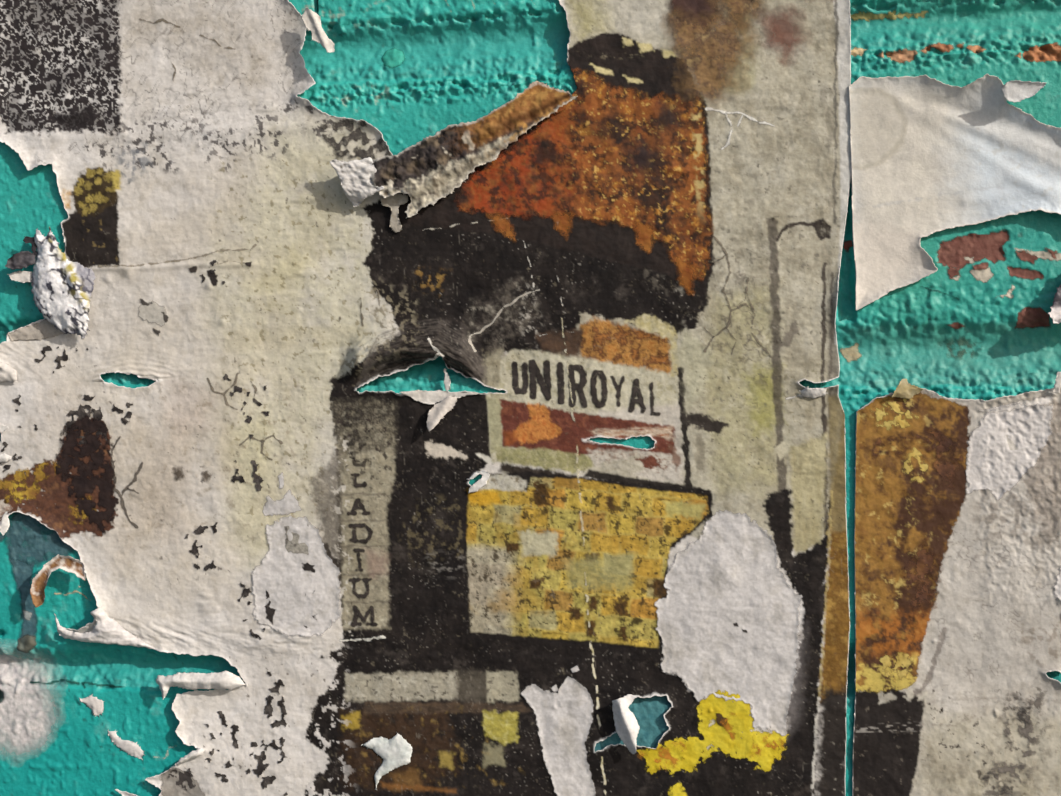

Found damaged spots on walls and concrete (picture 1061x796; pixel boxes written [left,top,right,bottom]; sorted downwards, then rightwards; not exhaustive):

peeling [851,43,986,63]
peeling [1016,42,1061,62]
peeling [937,231,1061,298]
peeling [1015,307,1050,329]
peeling [185,522,218,571]